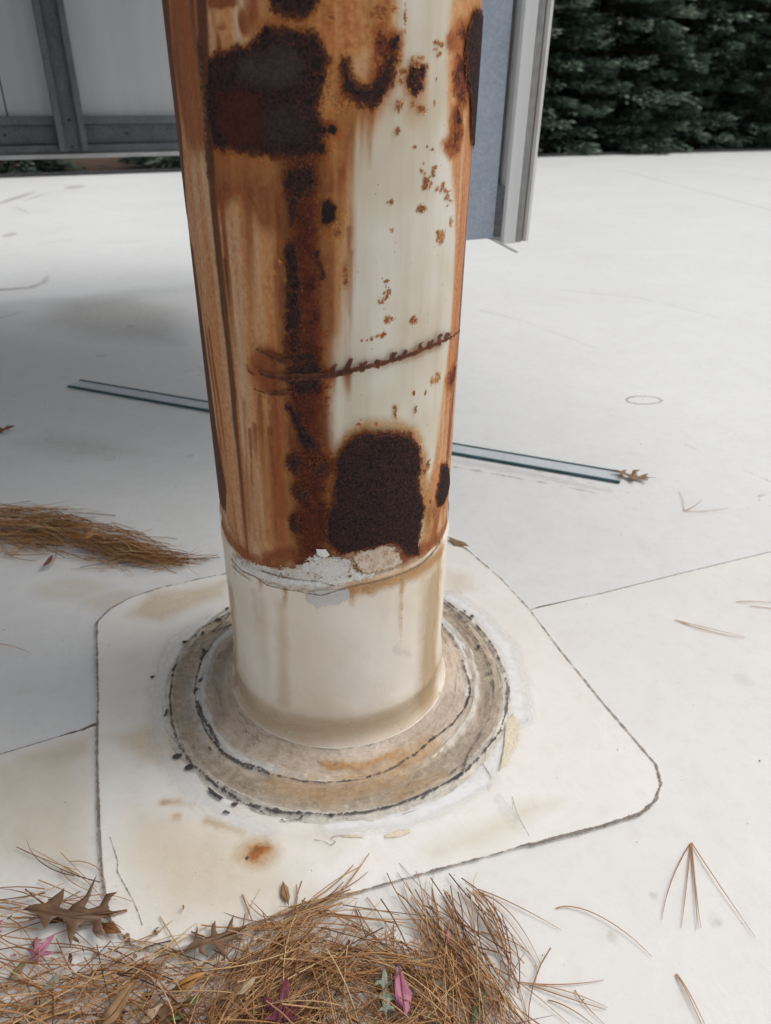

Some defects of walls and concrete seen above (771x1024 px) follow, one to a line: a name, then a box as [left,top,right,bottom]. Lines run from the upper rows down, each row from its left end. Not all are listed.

corrosion [162,0,484,597]
peeling [231,545,403,608]
corrosion [245,845,271,862]